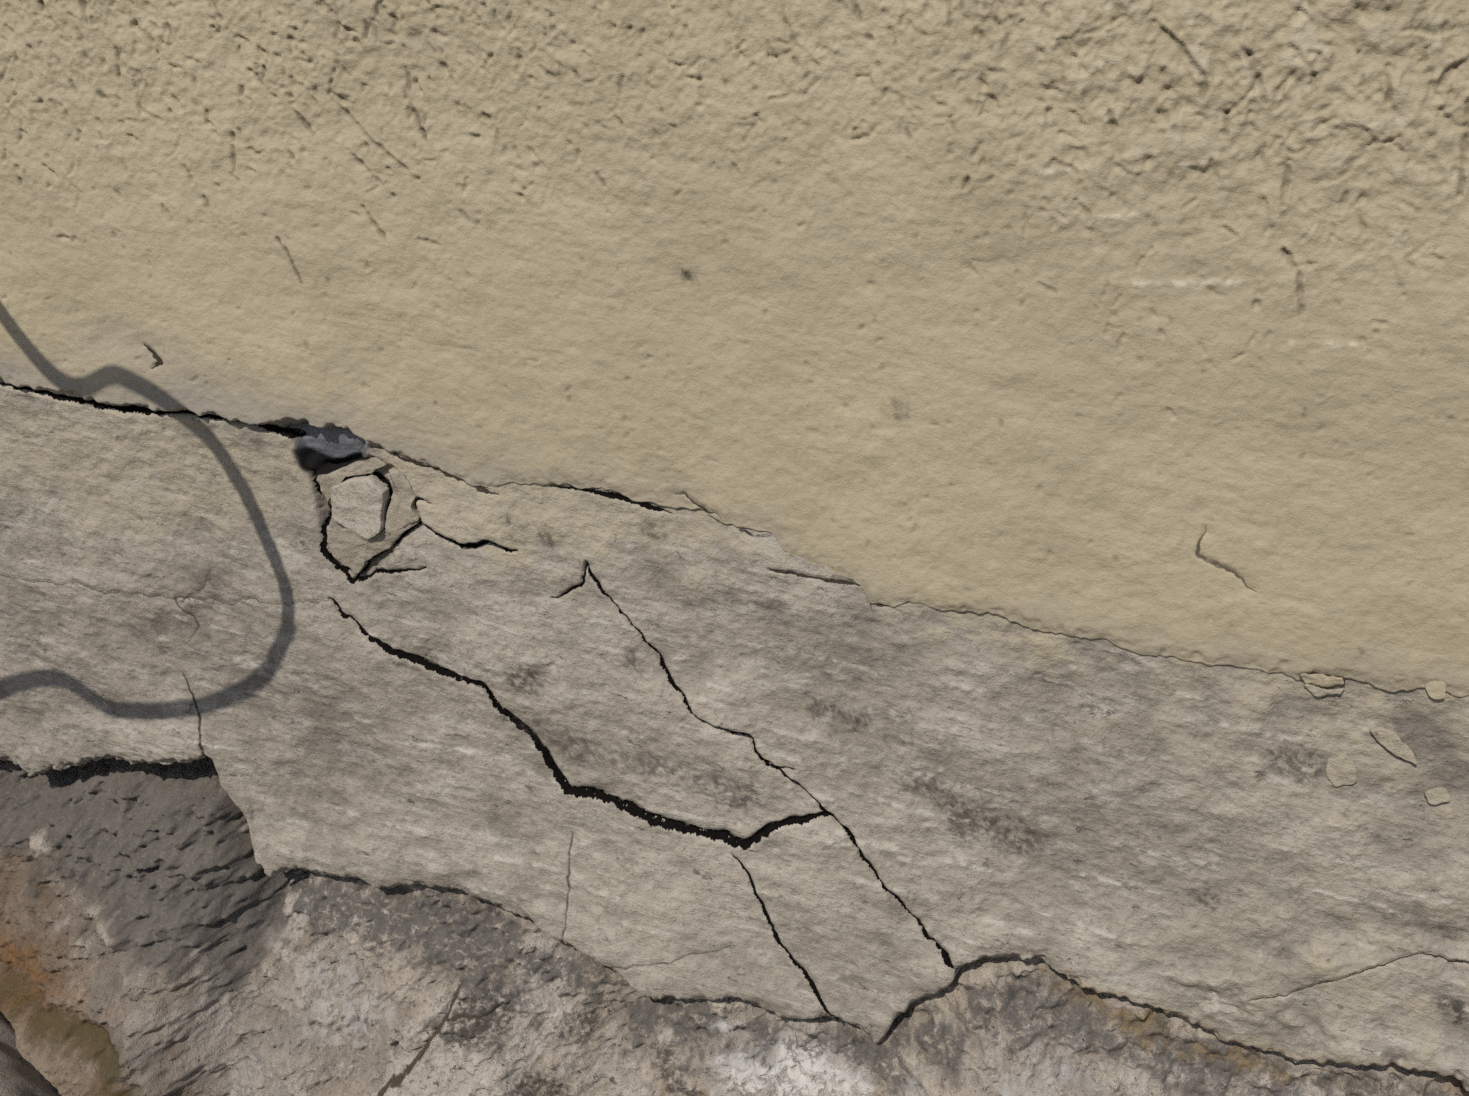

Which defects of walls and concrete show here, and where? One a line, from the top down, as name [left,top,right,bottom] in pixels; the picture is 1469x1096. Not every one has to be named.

spalling [288,422,421,574]
crack [0,382,958,1022]
peeling [1300,673,1344,697]
peeling [1325,752,1357,787]
peeling [1370,727,1417,765]
peeling [1424,787,1451,805]
spalling [0,756,622,1042]
crack [1249,953,1468,1001]
spalling [1439,999,1465,1024]
spalling [623,976,1299,1096]